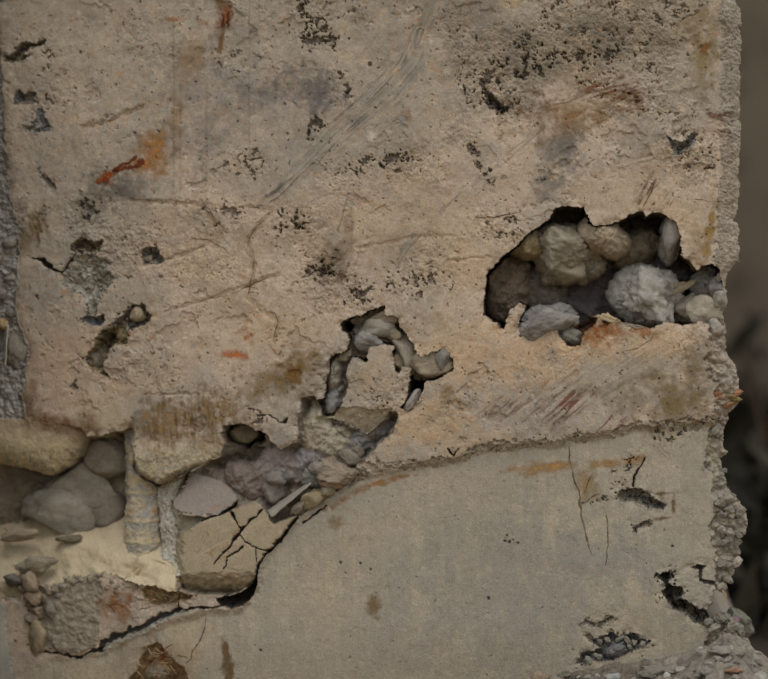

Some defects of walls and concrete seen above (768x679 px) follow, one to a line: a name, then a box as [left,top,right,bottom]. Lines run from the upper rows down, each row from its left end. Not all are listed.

corrosion [216,0,233,52]
corrosion [96,132,168,184]
crack [34,258,74,273]
spalling [61,253,152,332]
flaking render [354,310,454,378]
flaking render [537,223,595,285]
spalling [622,0,755,646]
peeling [173,473,239,515]
crack [201,503,326,574]
crack [569,449,608,566]
crack [43,605,223,664]
spalling [573,614,659,667]